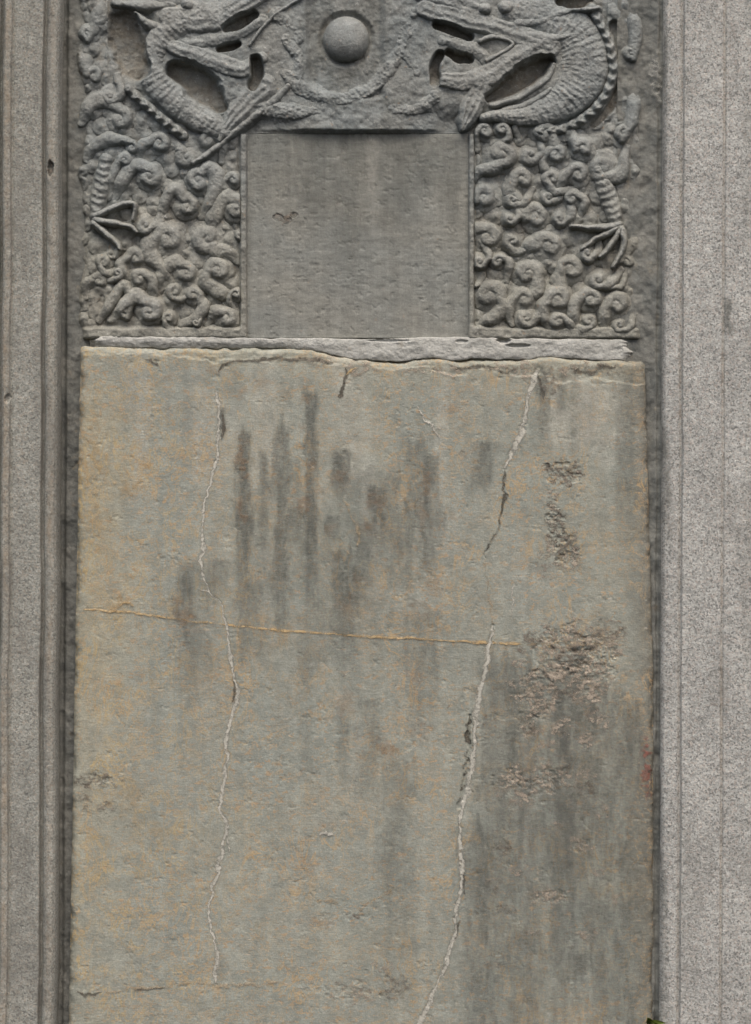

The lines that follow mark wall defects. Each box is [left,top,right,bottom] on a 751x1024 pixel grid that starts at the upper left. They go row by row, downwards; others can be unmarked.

crack [571,364,615,374]
water stain [236,431,252,554]
spalling [540,461,585,578]
crack [77,356,603,1024]
spalling [488,615,628,807]